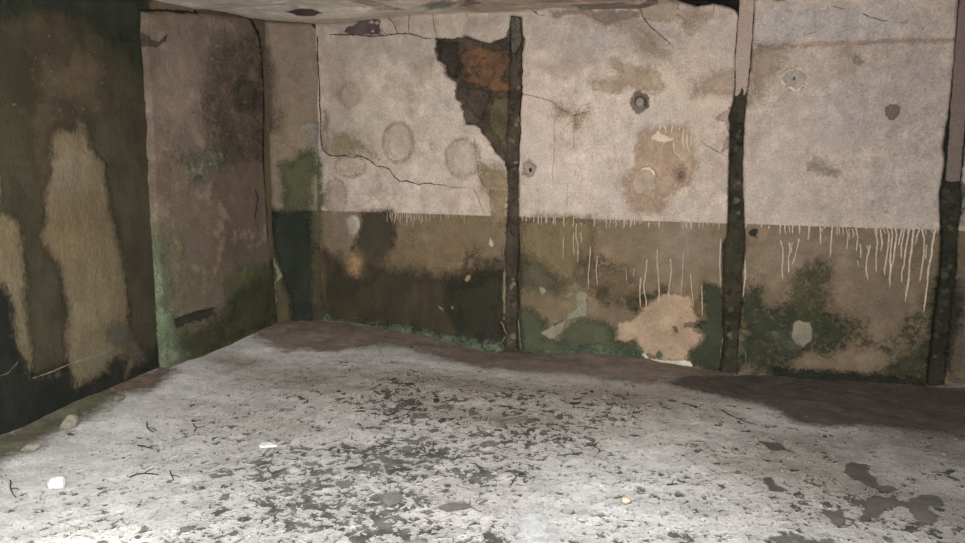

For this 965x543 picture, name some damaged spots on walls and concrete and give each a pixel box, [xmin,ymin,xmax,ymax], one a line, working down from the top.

peeling [345,19,384,35]
water stain [200,36,279,163]
crack [317,15,506,220]
spalling [434,31,523,162]
water stain [0,6,160,434]
water stain [320,164,568,353]
water stain [521,125,703,315]
peeling [616,293,703,367]
water stain [761,223,941,348]